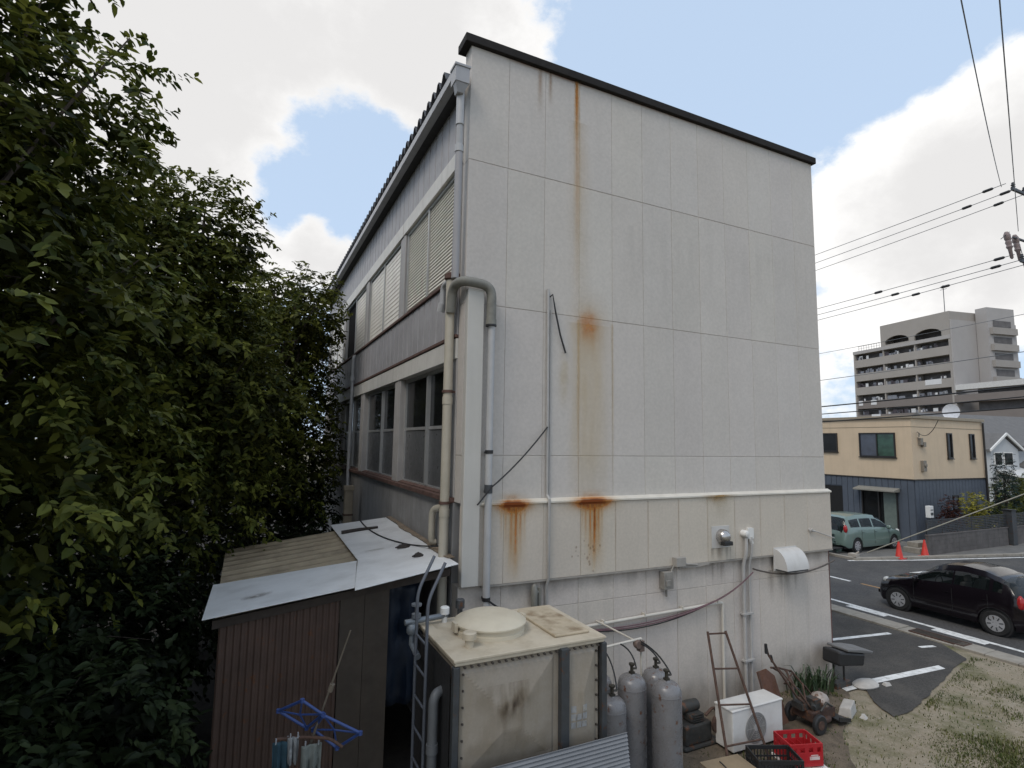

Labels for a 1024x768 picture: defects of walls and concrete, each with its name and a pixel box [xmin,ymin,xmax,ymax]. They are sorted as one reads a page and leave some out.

corrosion [498,500,529,550]
corrosion [574,497,612,543]